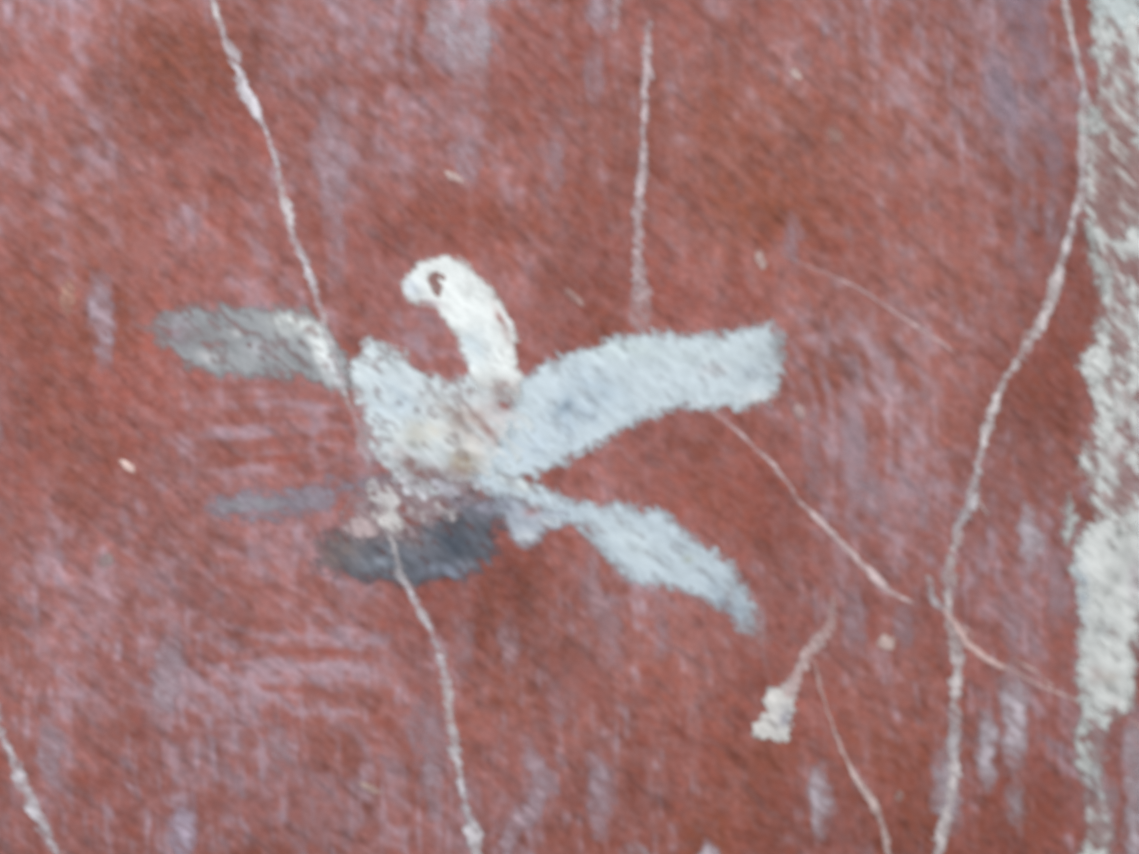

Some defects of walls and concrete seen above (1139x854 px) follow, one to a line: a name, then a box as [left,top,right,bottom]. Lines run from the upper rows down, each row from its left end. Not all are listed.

crack [211,0,337,362]
crack [632,33,654,300]
crack [735,429,784,478]
crack [799,0,1091,854]
crack [0,733,58,853]
crack [389,537,483,854]
leakage [1125,778,1139,854]